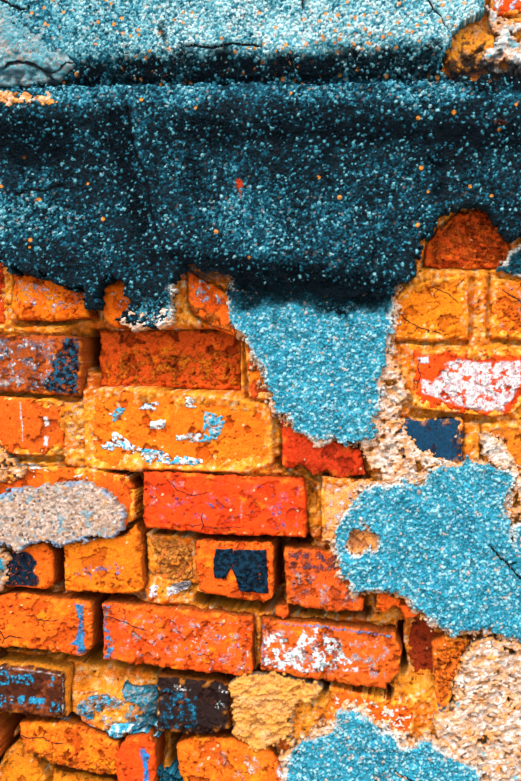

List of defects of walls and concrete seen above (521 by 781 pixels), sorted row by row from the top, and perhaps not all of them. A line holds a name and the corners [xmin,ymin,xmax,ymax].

crack [1,0,27,11]
crack [127,114,162,246]
peeling [0,338,80,393]
peeling [421,359,521,411]
peeling [101,407,203,465]
peeling [176,397,225,443]
flaking render [0,446,128,593]
peeling [213,548,269,594]
peeling [71,604,86,654]
peeling [262,624,391,676]
peeling [0,680,197,739]
peeling [140,749,184,781]